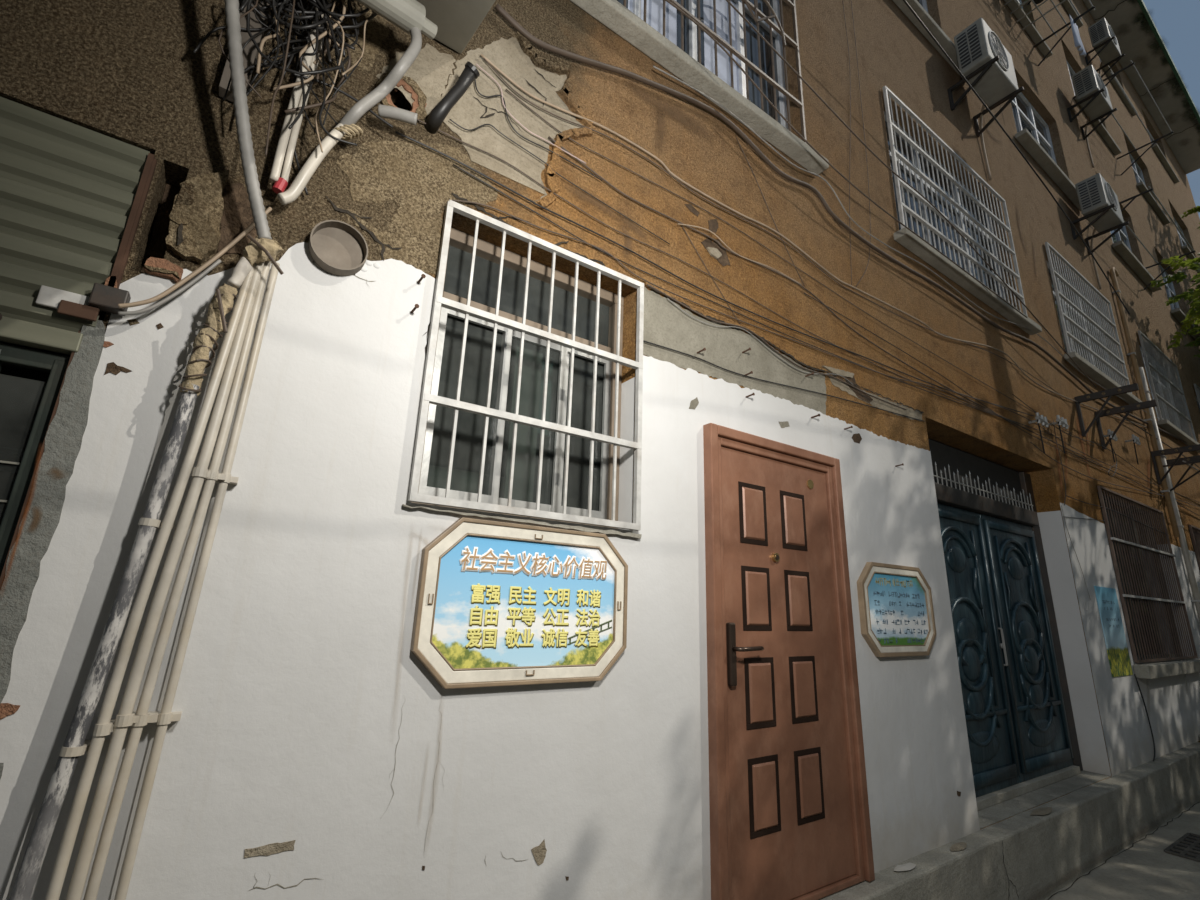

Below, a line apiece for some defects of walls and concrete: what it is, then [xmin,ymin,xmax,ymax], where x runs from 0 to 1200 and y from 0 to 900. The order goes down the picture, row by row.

peeling [325,6,593,275]
spalling [141,169,257,283]
peeling [643,281,922,421]
spalling [104,362,132,375]
spalling [0,703,21,719]
spalling [244,840,295,858]
spalling [531,839,547,865]
crack [251,876,324,890]